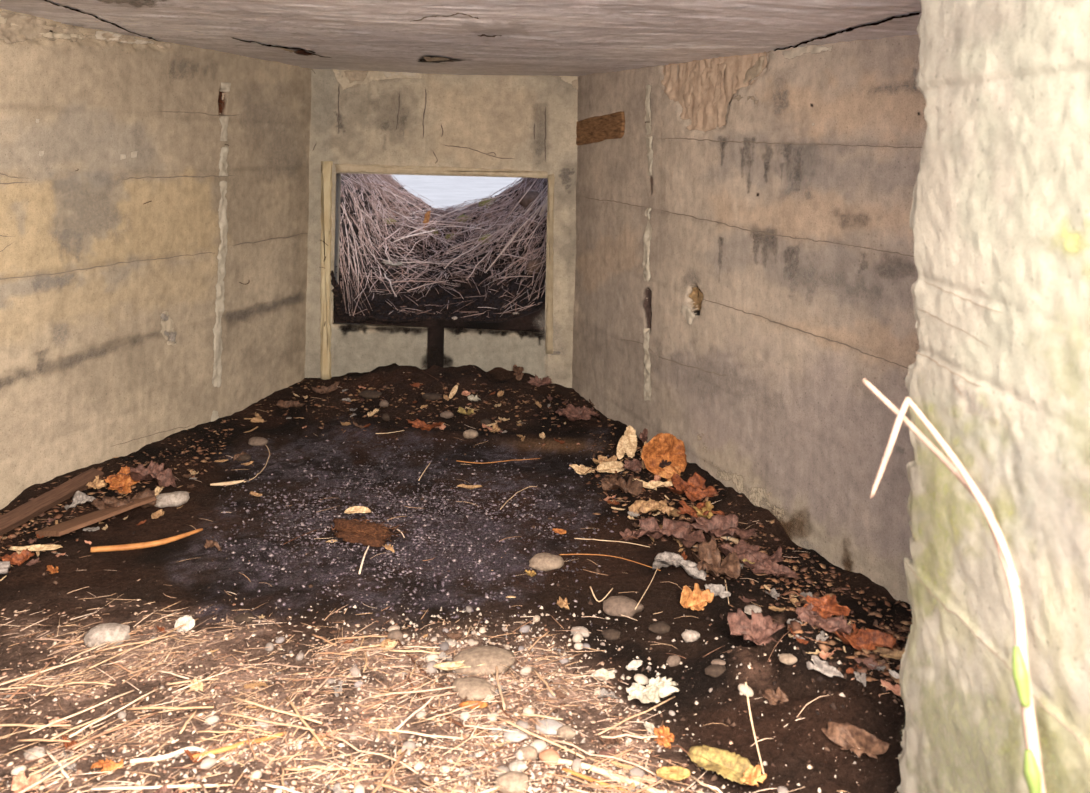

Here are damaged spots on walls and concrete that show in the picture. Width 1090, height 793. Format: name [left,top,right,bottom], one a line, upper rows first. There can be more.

crack [44,0,160,42]
crack [770,12,921,52]
peeling [661,52,767,132]